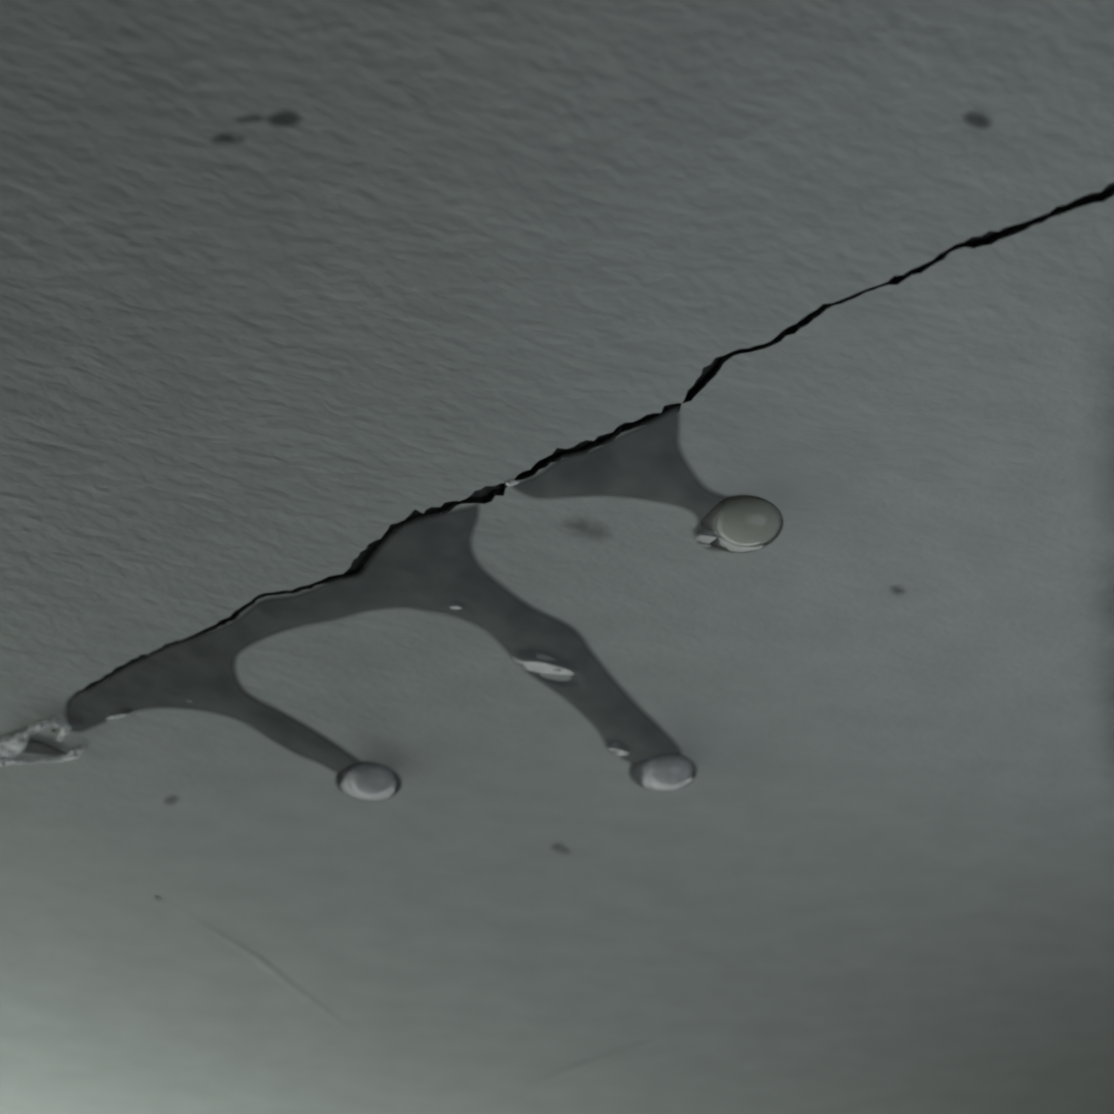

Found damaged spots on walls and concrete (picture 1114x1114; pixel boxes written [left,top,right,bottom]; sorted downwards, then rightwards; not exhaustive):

crack [67,182,1114,707]
water stain [506,410,727,550]
water stain [0,507,680,773]